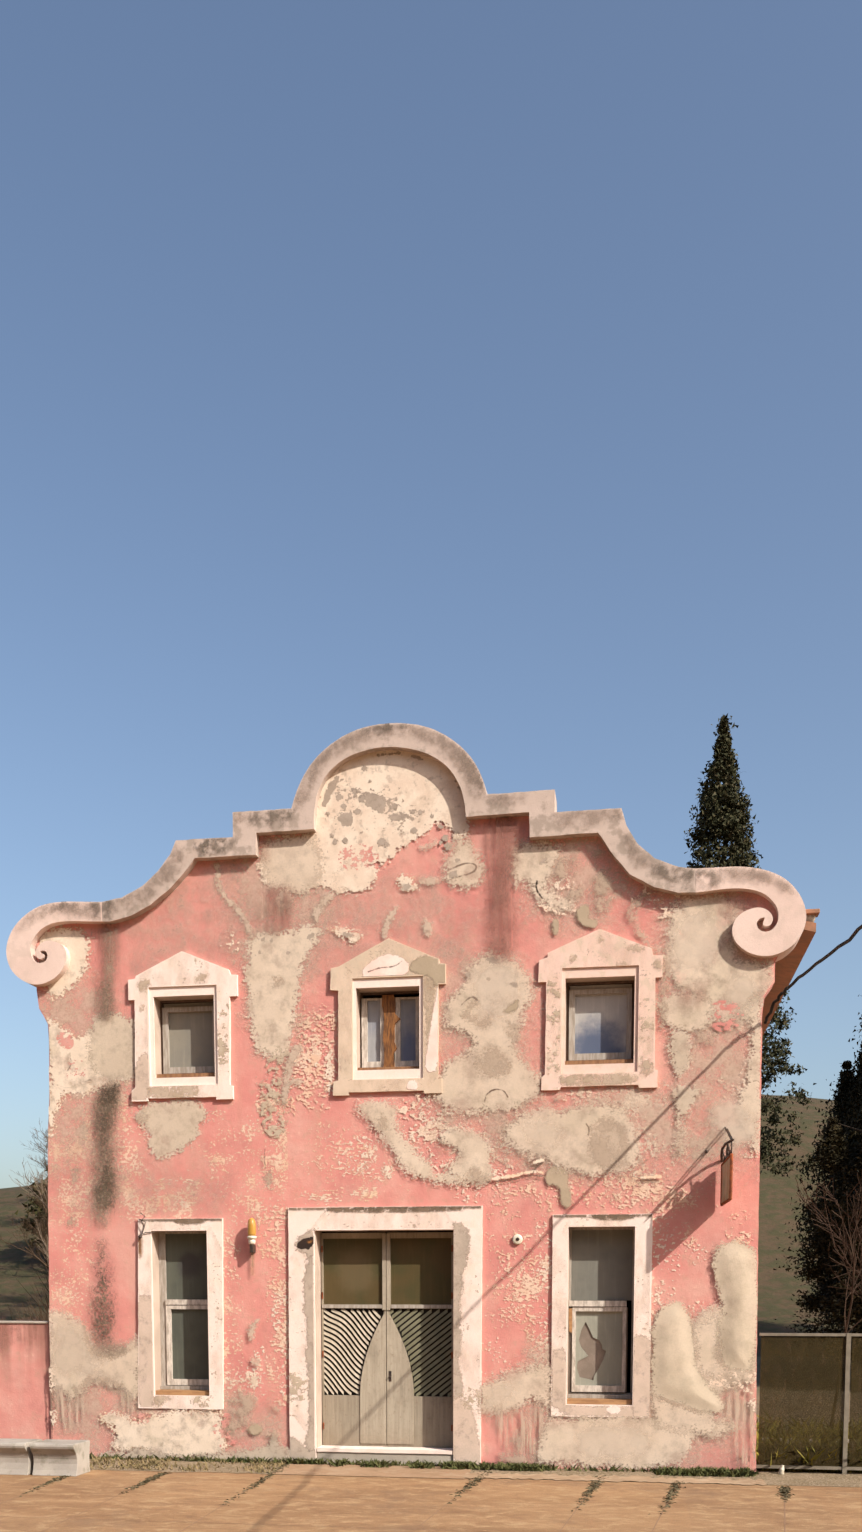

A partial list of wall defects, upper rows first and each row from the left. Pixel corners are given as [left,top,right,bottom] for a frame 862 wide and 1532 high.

peeling [233,845,334,981]
peeling [345,942,409,976]
leakage [250,724,516,952]
spalling [322,752,460,878]
peeling [519,837,681,976]
peeling [725,891,769,964]
leakage [94,1085,120,1222]
peeling [48,991,409,1461]
peeling [384,949,765,1465]
leakage [90,1241,120,1353]